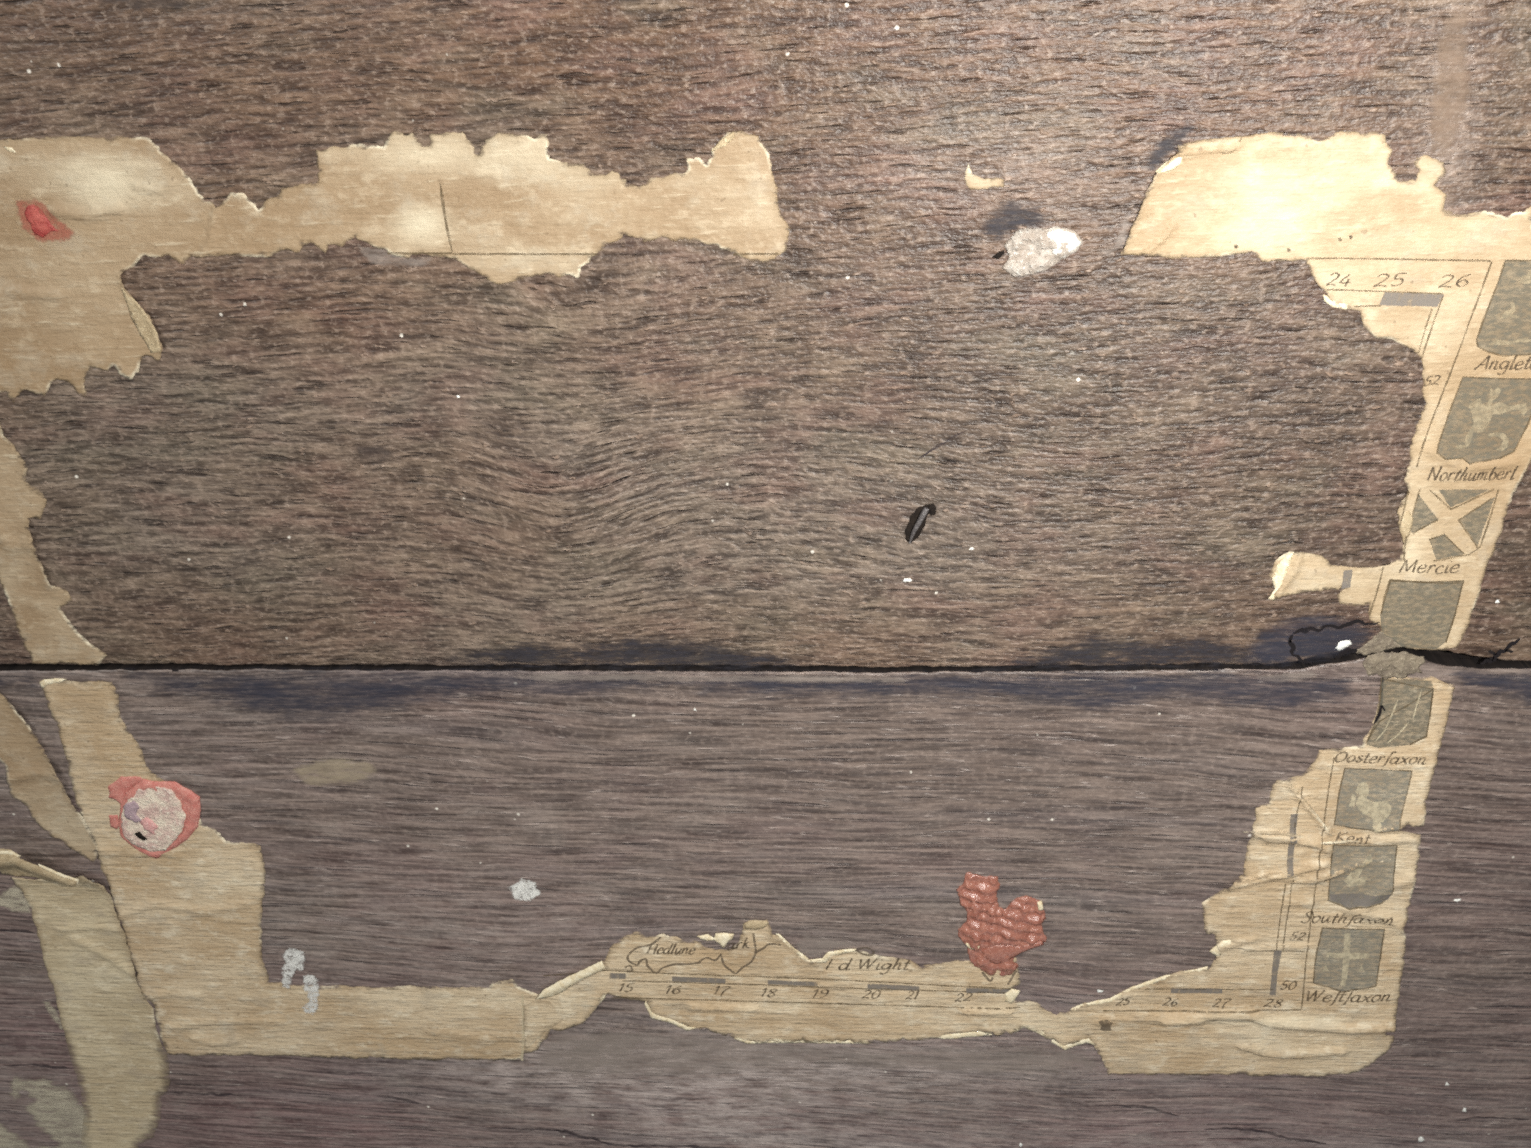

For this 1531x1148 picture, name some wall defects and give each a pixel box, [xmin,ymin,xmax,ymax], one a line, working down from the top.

peeling [964,164,1004,190]
spalling [905,504,930,543]
crack [1481,638,1520,664]
crack [491,1127,719,1148]